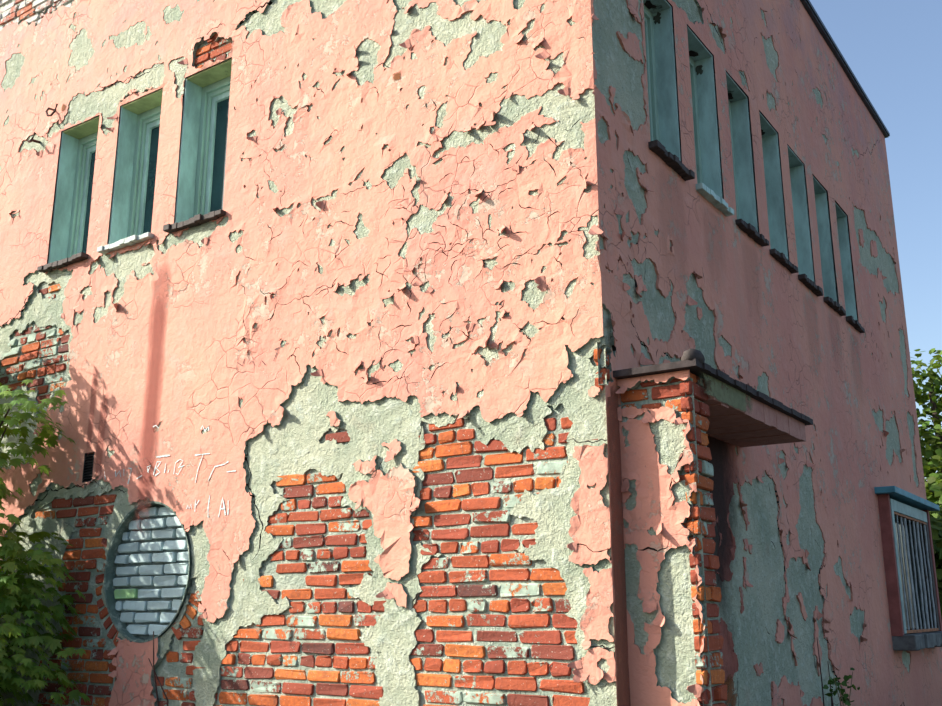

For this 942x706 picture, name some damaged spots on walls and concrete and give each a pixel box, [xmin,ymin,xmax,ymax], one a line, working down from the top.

peeling [0,0,347,157]
peeling [754,8,793,86]
flaking render [0,216,244,469]
peeling [244,180,282,199]
crack [243,256,342,329]
crack [268,119,591,385]
peeling [268,0,771,397]
crack [611,313,669,358]
peeling [849,197,910,398]
flaking render [149,302,867,706]
peeling [872,399,919,488]